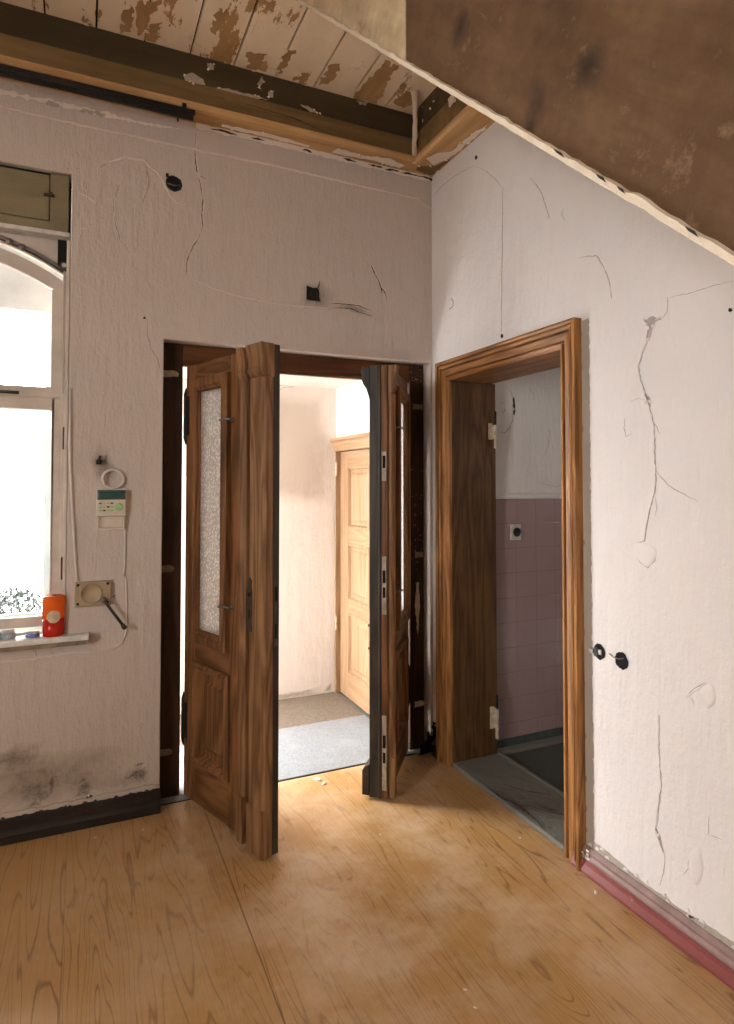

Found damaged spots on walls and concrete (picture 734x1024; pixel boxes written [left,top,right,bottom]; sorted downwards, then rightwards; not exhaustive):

peeling [120,0,163,43]
peeling [210,7,233,35]
peeling [260,0,280,16]
peeling [184,63,215,85]
peeling [217,48,340,100]
peeling [353,60,434,122]
peeling [196,122,487,181]
crack [186,129,205,273]
crack [334,265,388,316]
crack [579,255,612,297]
crack [624,340,695,545]
crack [655,716,721,885]